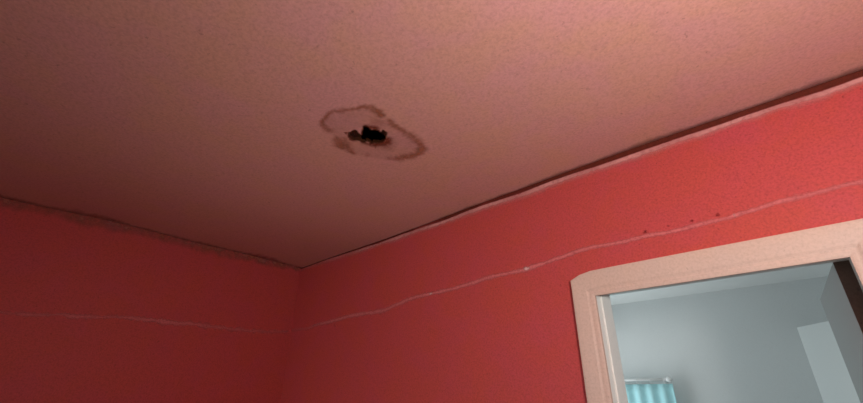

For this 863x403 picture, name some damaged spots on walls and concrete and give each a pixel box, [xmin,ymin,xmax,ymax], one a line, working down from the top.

spalling [349,126,387,144]
crack [312,180,863,327]